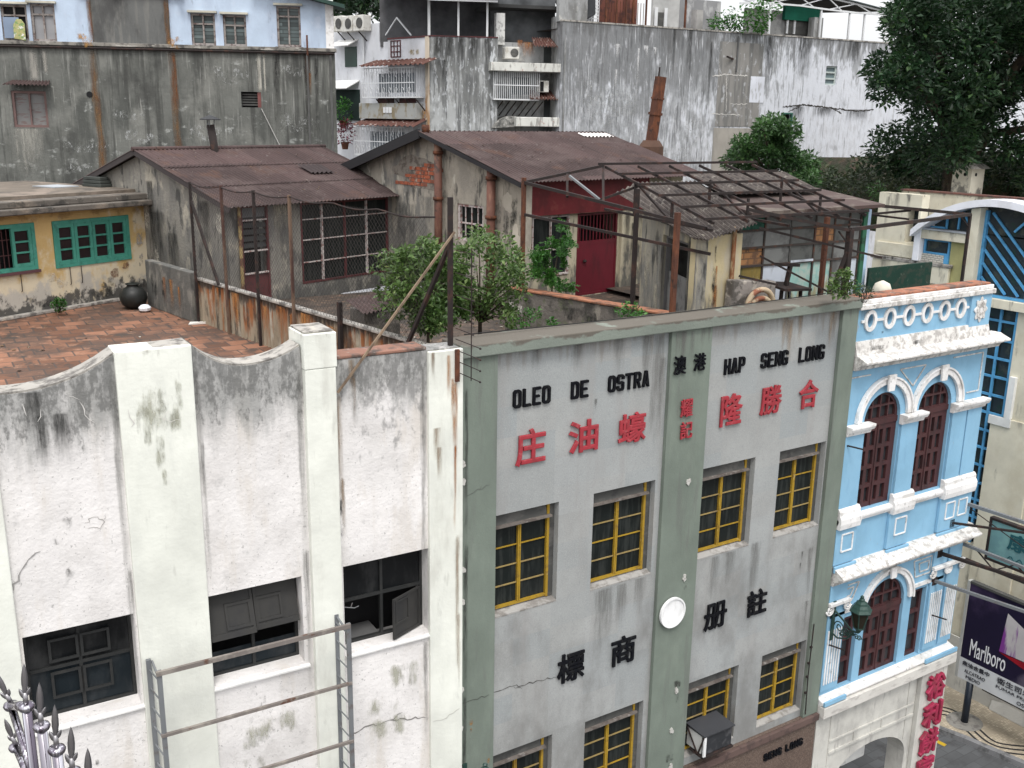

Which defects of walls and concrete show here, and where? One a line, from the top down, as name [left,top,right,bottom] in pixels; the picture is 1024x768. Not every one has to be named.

leakage [30,52,46,78]
leakage [257,55,285,91]
crack [783,104,874,114]
spalling [392,154,443,191]
leakage [29,392,67,440]
crack [354,677,555,734]